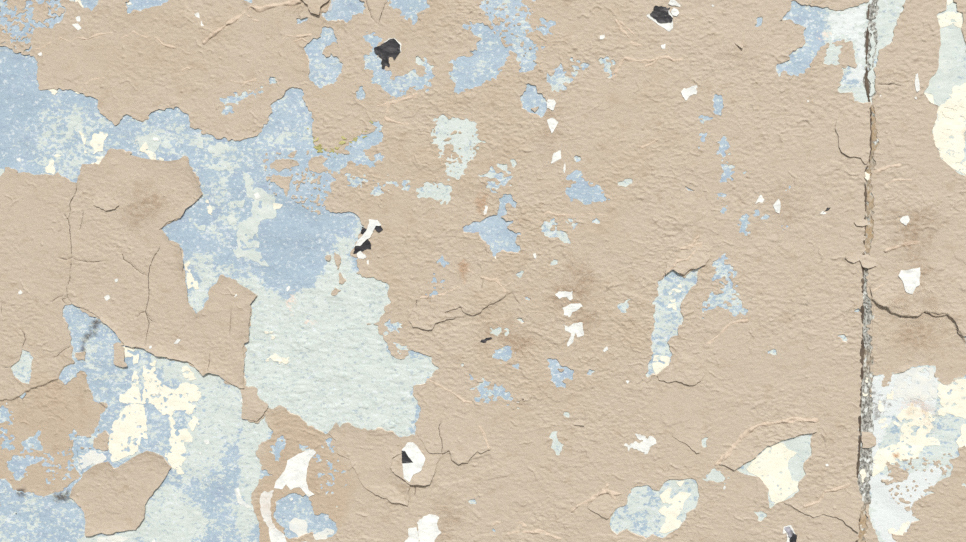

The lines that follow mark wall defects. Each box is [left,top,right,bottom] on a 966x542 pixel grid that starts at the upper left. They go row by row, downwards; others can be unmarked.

peeling [449,0,615,117]
peeling [776,0,905,164]
peeling [924,0,966,176]
peeling [0,0,507,542]
peeling [463,159,521,259]
peeling [541,218,578,244]
peeling [547,358,574,388]
peeling [565,156,610,205]
peeling [646,245,751,377]
crack [855,0,897,542]
peeling [610,422,818,538]
peeling [861,365,966,542]